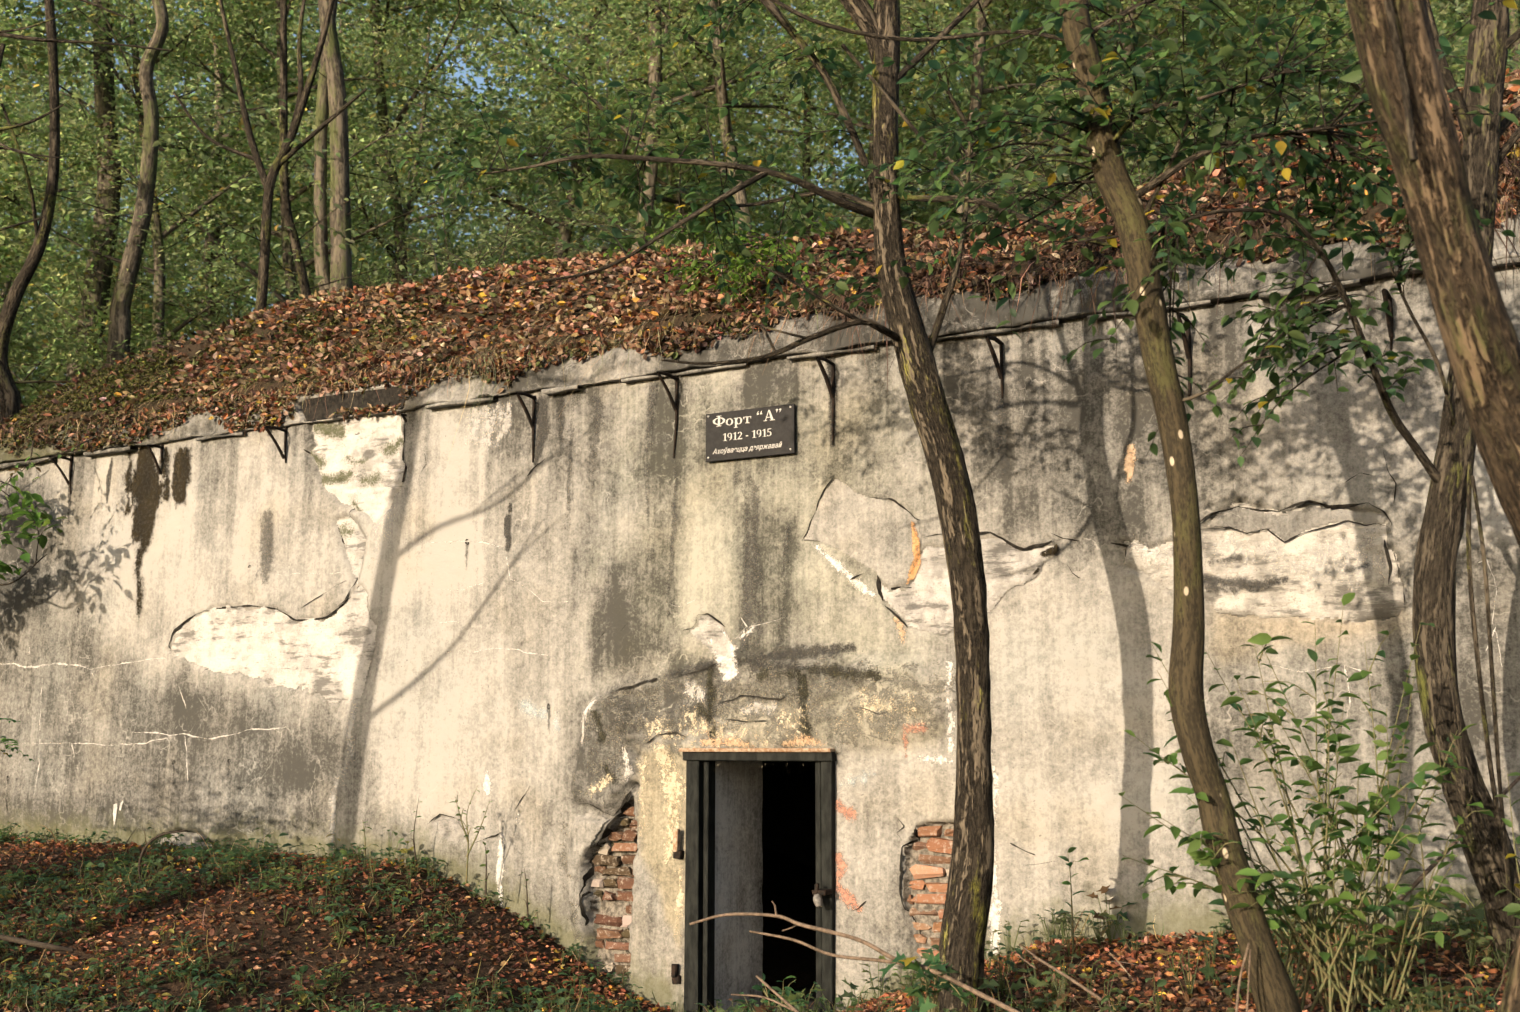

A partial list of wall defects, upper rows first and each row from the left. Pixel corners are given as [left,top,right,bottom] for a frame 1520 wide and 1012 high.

flaking render [301,387,407,524]
leakage [106,445,192,617]
flaking render [802,478,954,641]
flaking render [980,531,1059,612]
flaking render [1111,540,1173,591]
flaking render [1200,500,1408,622]
flaking render [169,581,377,703]
flaking render [685,613,754,682]
flaking render [579,787,638,985]
flaking render [897,819,954,961]